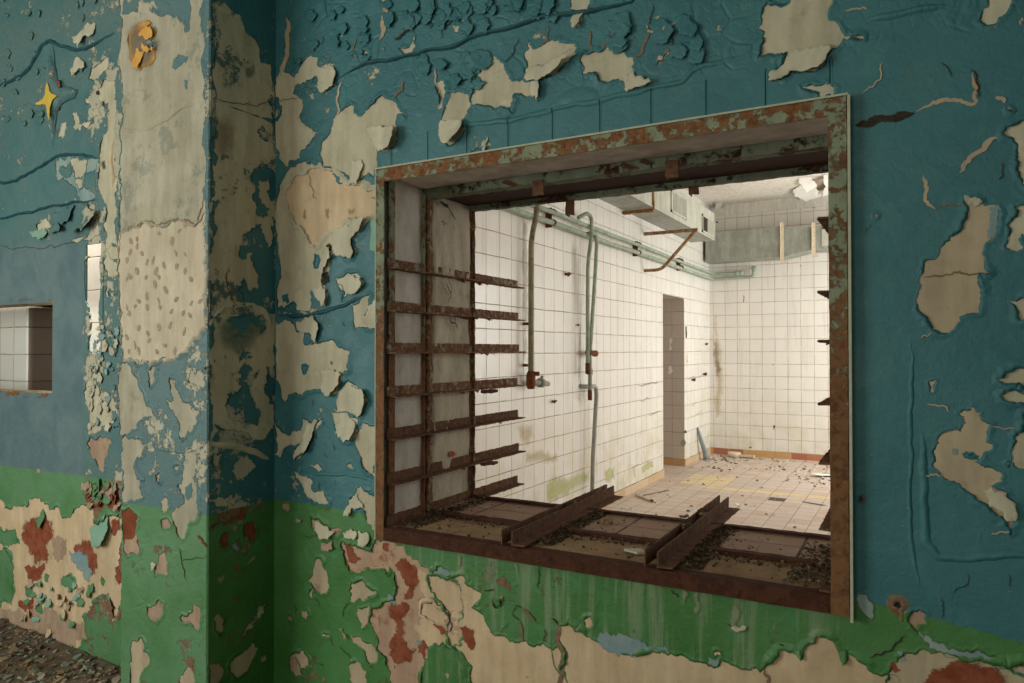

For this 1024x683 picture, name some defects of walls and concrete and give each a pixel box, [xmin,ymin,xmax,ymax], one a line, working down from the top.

peeling [351,0,654,153]
peeling [649,13,705,64]
peeling [753,0,869,99]
peeling [971,0,1017,31]
peeling [793,174,828,201]
peeling [911,104,1024,340]
peeling [0,0,408,650]
peeling [924,358,1024,538]
flaking render [294,462,1024,683]
peeling [128,634,152,683]
peeling [177,601,267,683]
peeling [286,647,313,681]